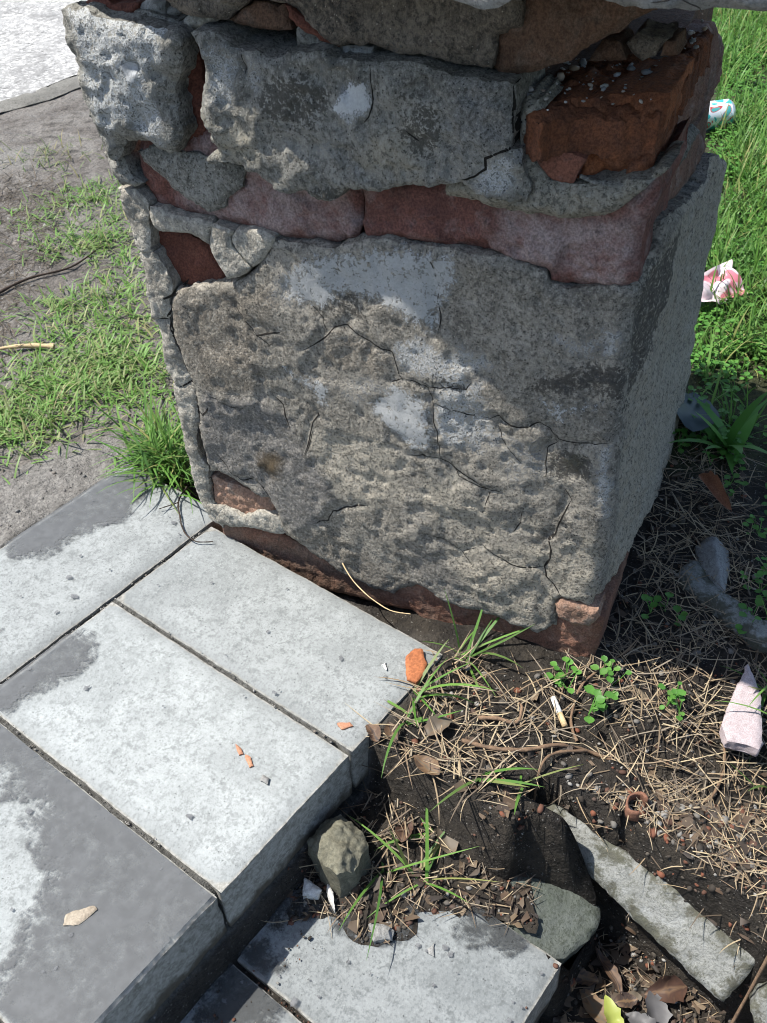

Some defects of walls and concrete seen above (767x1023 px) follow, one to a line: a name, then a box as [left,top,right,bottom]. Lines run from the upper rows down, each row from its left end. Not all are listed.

flaking render [118,183,285,534]
crack [159,279,269,500]
crack [237,308,280,345]
crack [277,398,319,454]
crack [299,289,605,508]
crack [314,504,365,524]
crack [427,489,572,596]